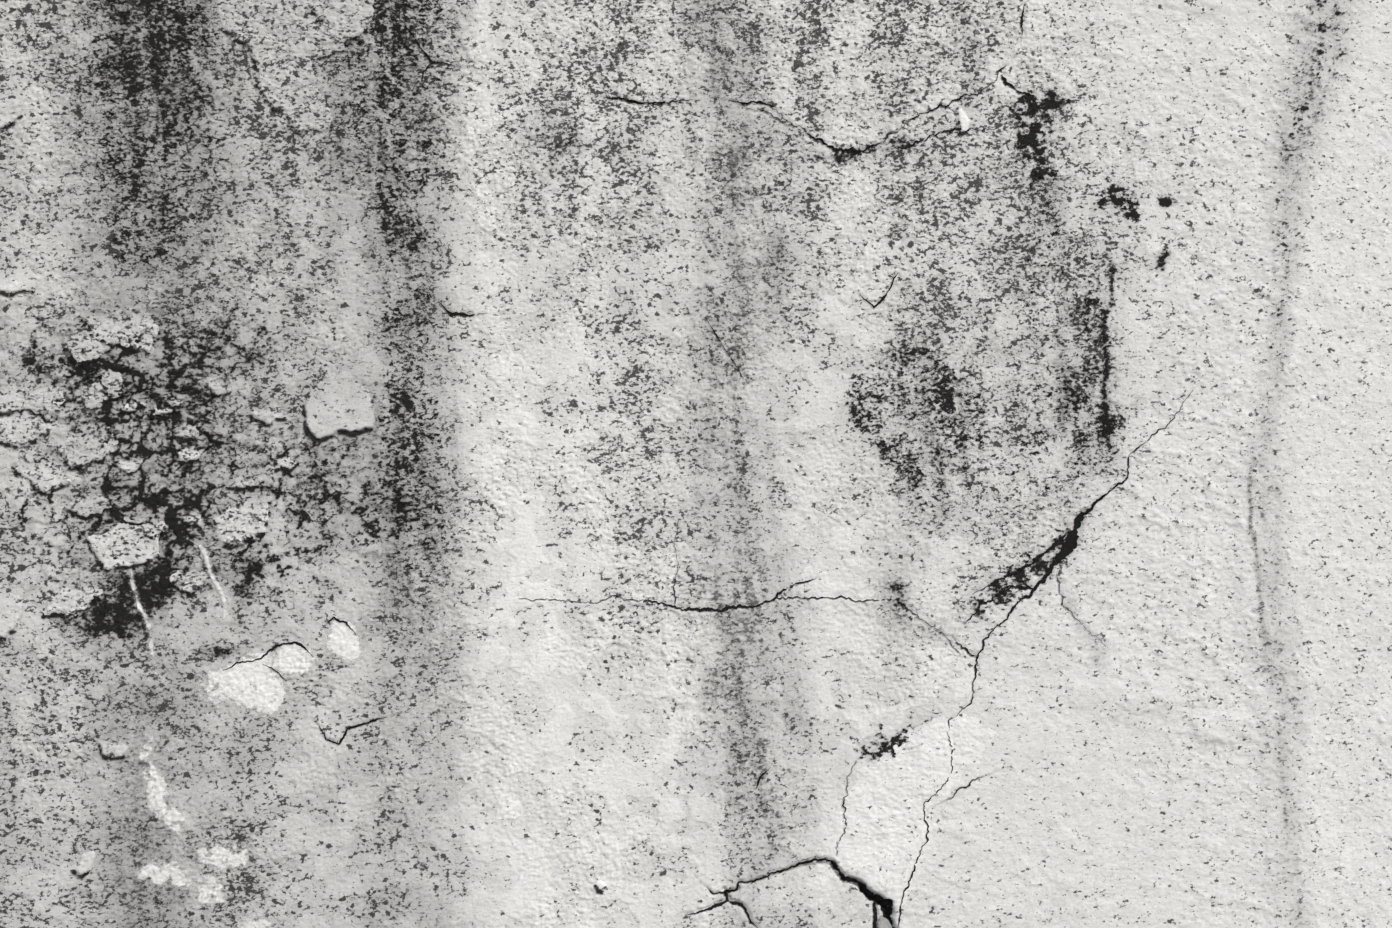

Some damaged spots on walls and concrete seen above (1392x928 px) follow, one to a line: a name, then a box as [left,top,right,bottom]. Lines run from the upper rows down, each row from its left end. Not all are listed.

flaking render [0,590,24,641]
spalling [0,308,298,624]
damp [0,0,472,667]
crack [605,97,692,105]
damp [681,0,811,884]
crack [520,393,1191,928]
damp [814,135,925,166]
crack [728,65,1035,153]
damp [836,85,1145,649]
damp [1139,248,1170,271]